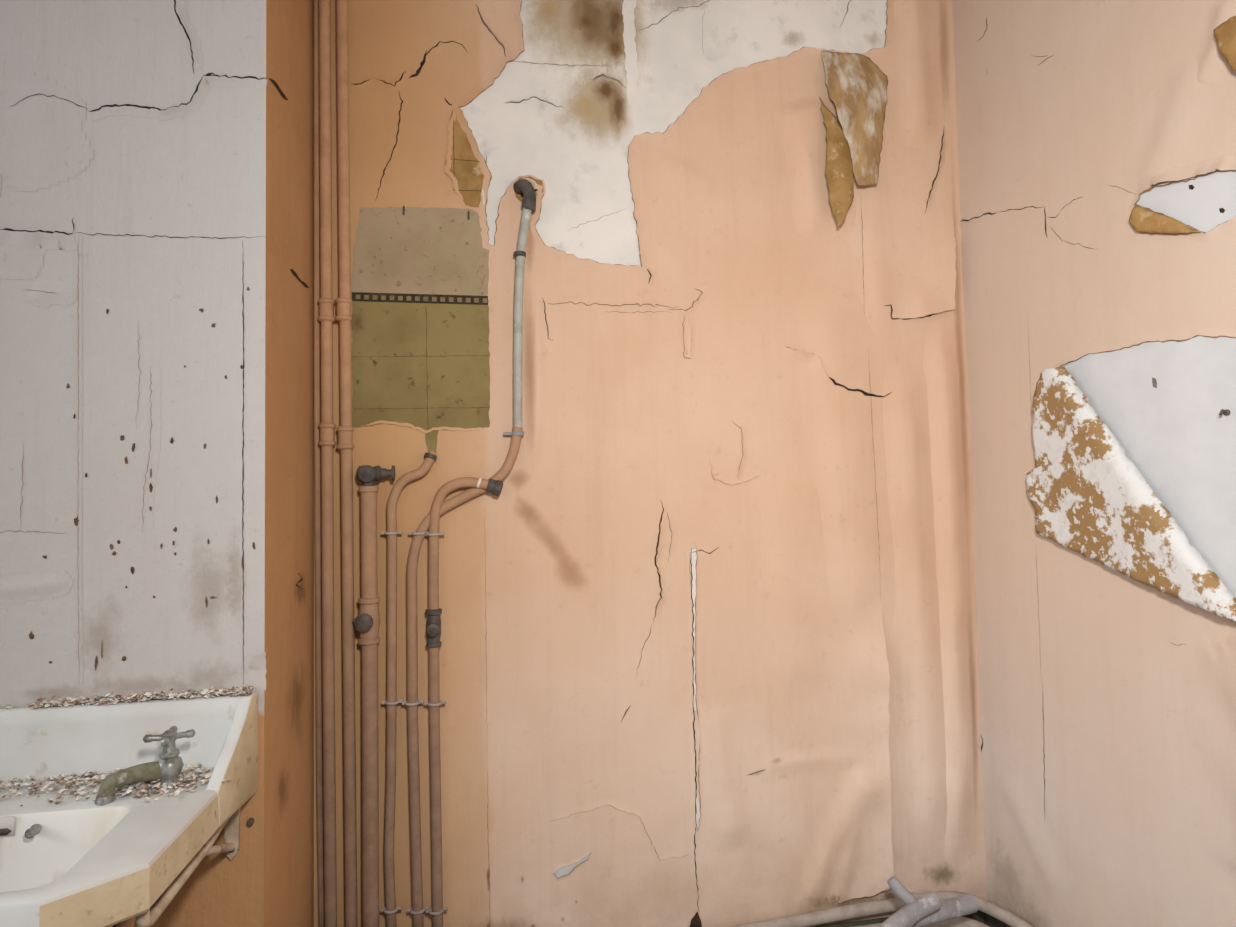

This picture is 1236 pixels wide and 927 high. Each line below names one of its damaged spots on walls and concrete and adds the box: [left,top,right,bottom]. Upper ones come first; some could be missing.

crack [9,0,288,121]
crack [351,41,467,201]
crack [504,93,564,107]
crack [476,2,626,88]
leakage [537,0,639,57]
leakage [571,80,624,131]
crack [924,127,950,215]
crack [960,197,1093,249]
crack [0,219,259,685]
crack [782,347,891,597]
crack [621,497,719,914]